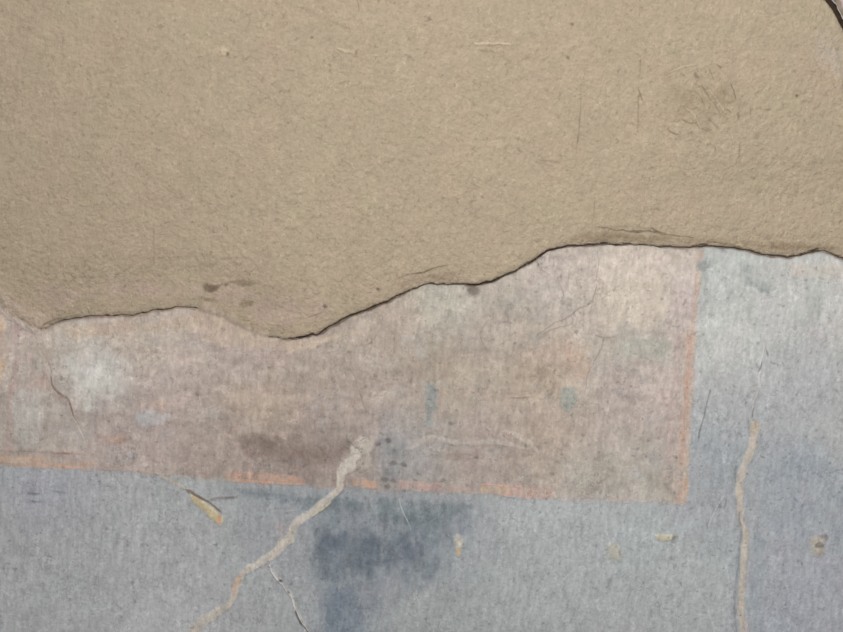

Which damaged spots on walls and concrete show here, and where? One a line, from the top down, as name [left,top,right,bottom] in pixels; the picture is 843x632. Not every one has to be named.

spalling [200,278,256,304]
peeling [57,344,133,414]
peeling [10,386,48,450]
spalling [158,475,238,526]
crack [186,366,384,632]
leakage [219,429,484,632]
crack [732,342,785,632]